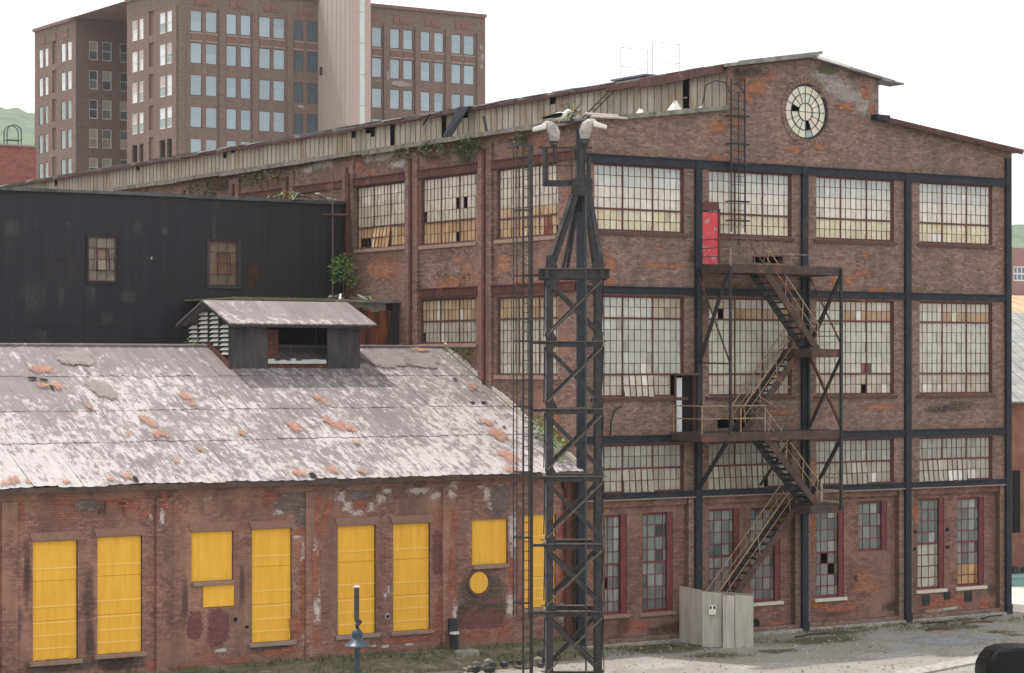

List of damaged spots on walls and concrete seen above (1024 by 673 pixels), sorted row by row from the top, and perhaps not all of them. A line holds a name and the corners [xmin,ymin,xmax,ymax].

spalling [833,84,876,115]
corrosion [354,307,391,345]